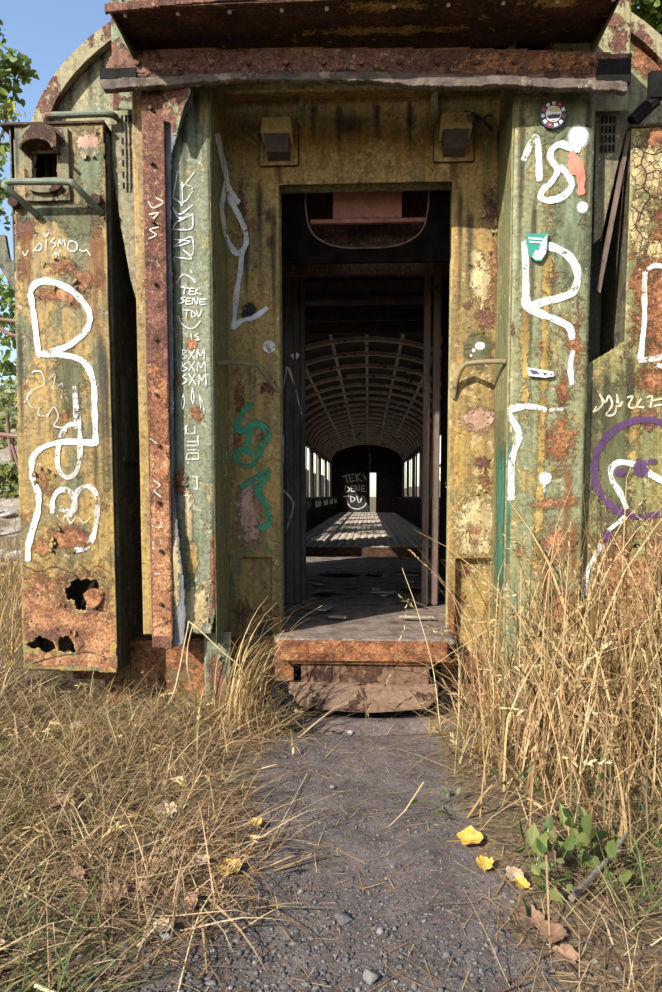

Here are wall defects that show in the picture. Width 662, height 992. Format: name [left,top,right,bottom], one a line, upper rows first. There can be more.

rust [608,13,624,30]
rust [15,193,106,308]
peeling [465,249,492,313]
peeling [462,325,495,370]
peeling [513,90,593,581]
rust [621,170,662,395]
crack [631,145,662,250]
rust [147,343,188,637]
peeling [451,429,511,596]
rust [526,299,662,670]